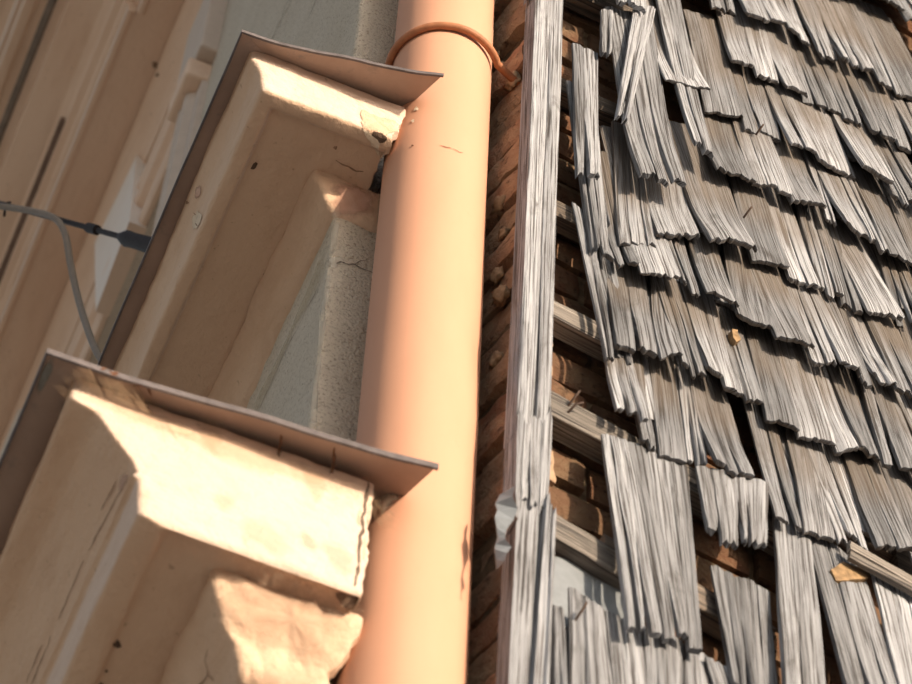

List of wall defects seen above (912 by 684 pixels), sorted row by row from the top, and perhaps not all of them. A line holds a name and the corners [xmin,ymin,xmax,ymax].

flaking render [360,109,399,155]
crack [354,482,371,586]
spalling [336,593,359,610]